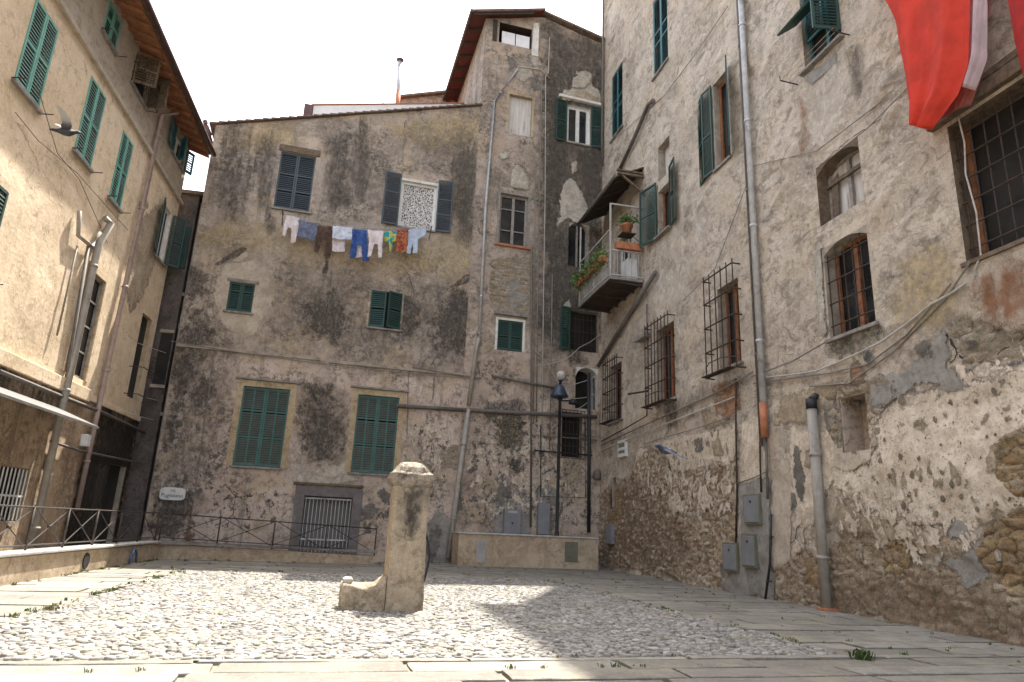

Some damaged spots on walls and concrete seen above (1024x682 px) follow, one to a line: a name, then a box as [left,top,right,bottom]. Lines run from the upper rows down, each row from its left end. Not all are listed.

damp [198,119,475,357]
damp [150,466,192,540]
damp [162,265,216,453]
damp [296,383,361,487]
peeling [635,379,771,523]
peeling [773,317,1024,598]